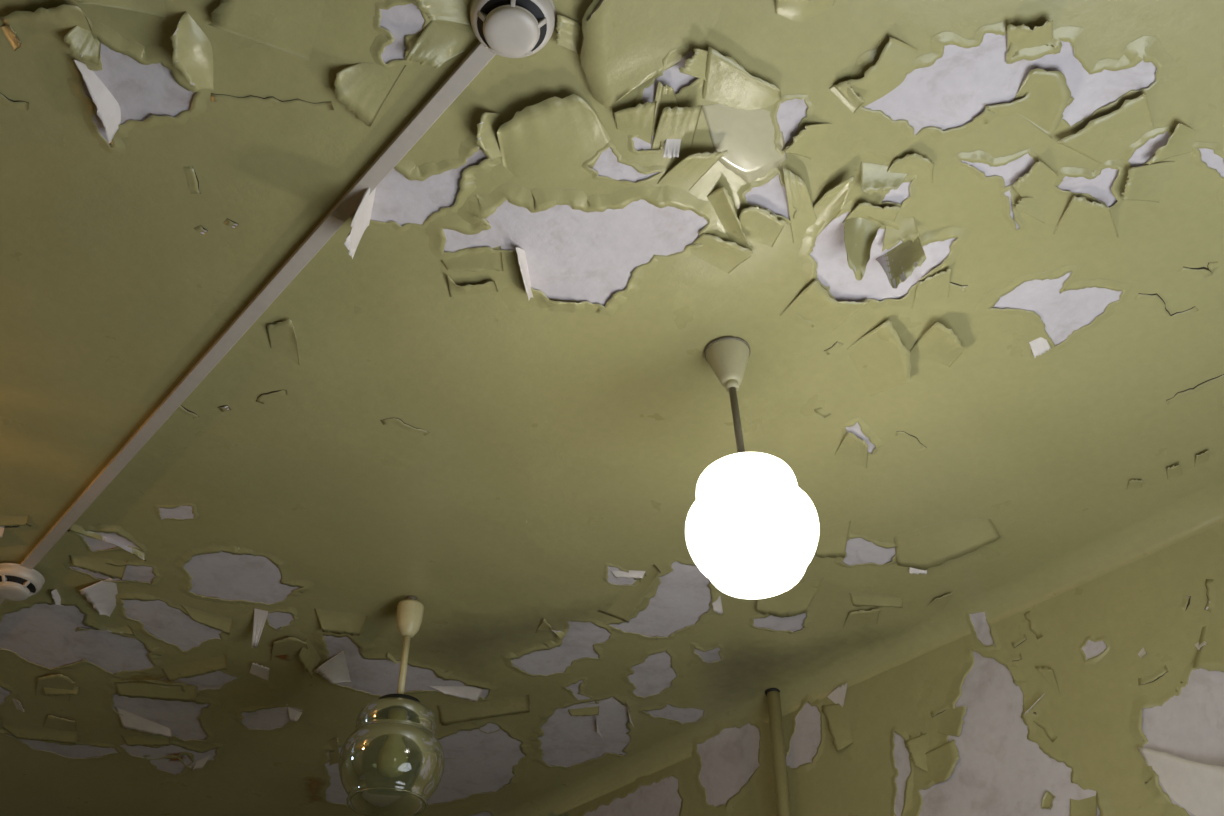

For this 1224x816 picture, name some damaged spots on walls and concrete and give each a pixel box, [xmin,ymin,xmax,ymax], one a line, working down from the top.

peeling [0,0,325,155]
peeling [334,0,1224,396]
peeling [0,523,498,776]
peeling [316,738,354,808]
peeling [362,736,423,796]
peeling [423,557,766,816]
peeling [748,577,824,635]
peeling [785,682,853,775]
peeling [889,609,1115,816]
peeling [1129,619,1224,816]